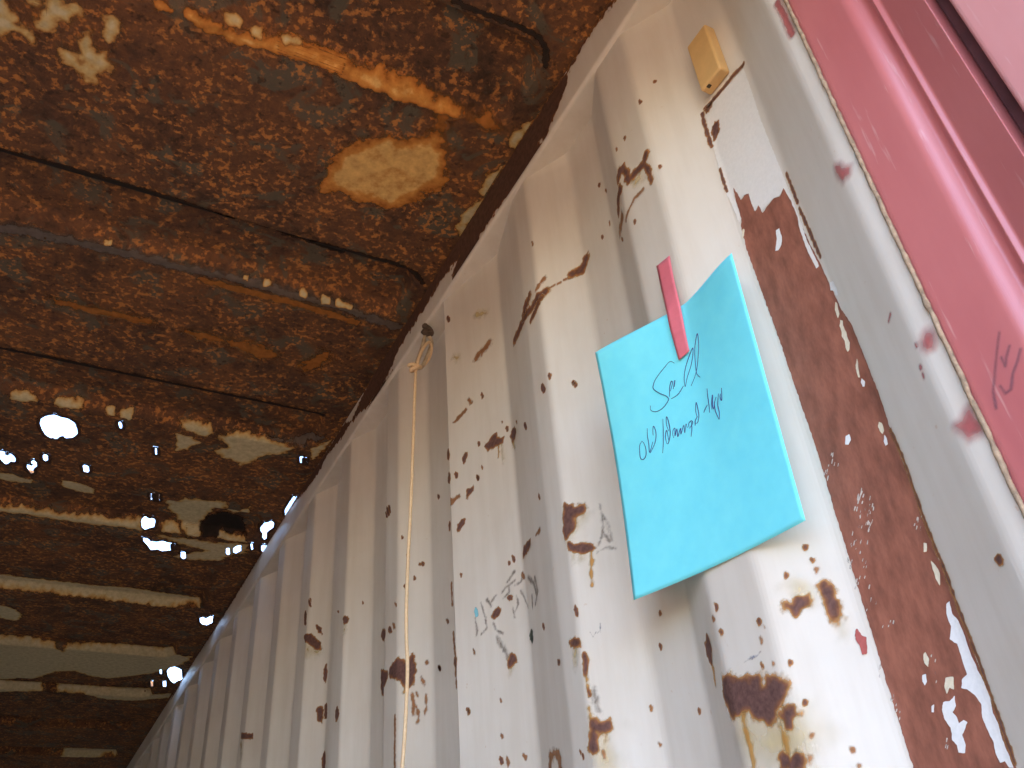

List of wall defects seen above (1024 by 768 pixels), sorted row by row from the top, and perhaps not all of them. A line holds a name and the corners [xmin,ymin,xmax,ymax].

corrosion [0,148,235,219]
corrosion [598,149,662,241]
corrosion [50,297,154,324]
corrosion [0,347,325,417]
corrosion [152,0,617,697]
corrosion [781,544,843,625]
corrosion [316,703,339,723]
corrosion [381,653,441,723]
corrosion [569,637,613,760]
corrosion [704,603,812,768]
peeling [931,601,1014,768]
corrosion [549,749,562,768]